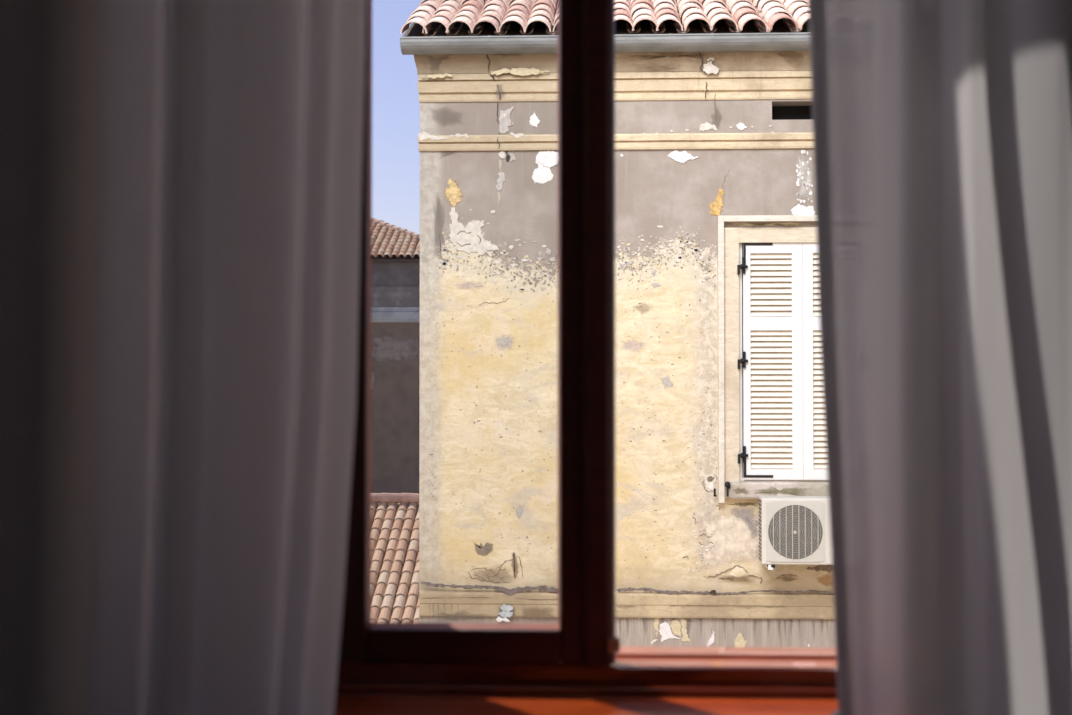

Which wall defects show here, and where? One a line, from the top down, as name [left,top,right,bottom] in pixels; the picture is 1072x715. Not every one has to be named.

spalling [490,68,550,76]
spalling [703,57,719,75]
crack [486,54,507,153]
spalling [498,107,540,138]
spalling [418,132,468,140]
peeling [668,150,700,164]
peeling [709,171,729,216]
peeling [791,150,816,215]
peeling [432,150,558,438]
spalling [496,604,514,622]
peeling [651,618,691,644]